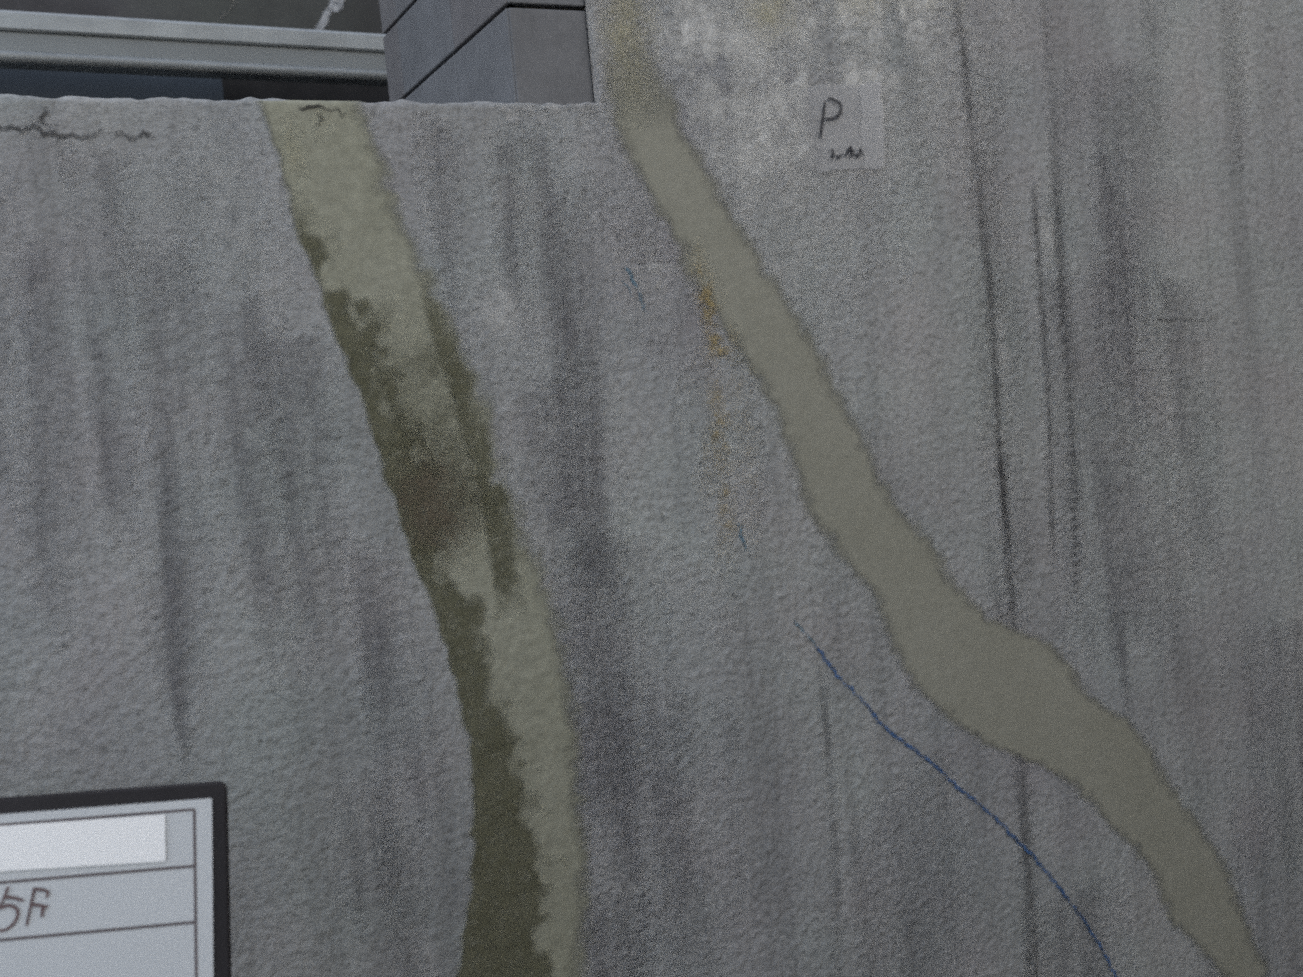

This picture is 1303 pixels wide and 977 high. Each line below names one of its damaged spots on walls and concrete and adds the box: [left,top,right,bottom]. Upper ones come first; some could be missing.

water stain [302,233,325,267]
water stain [325,290,551,977]